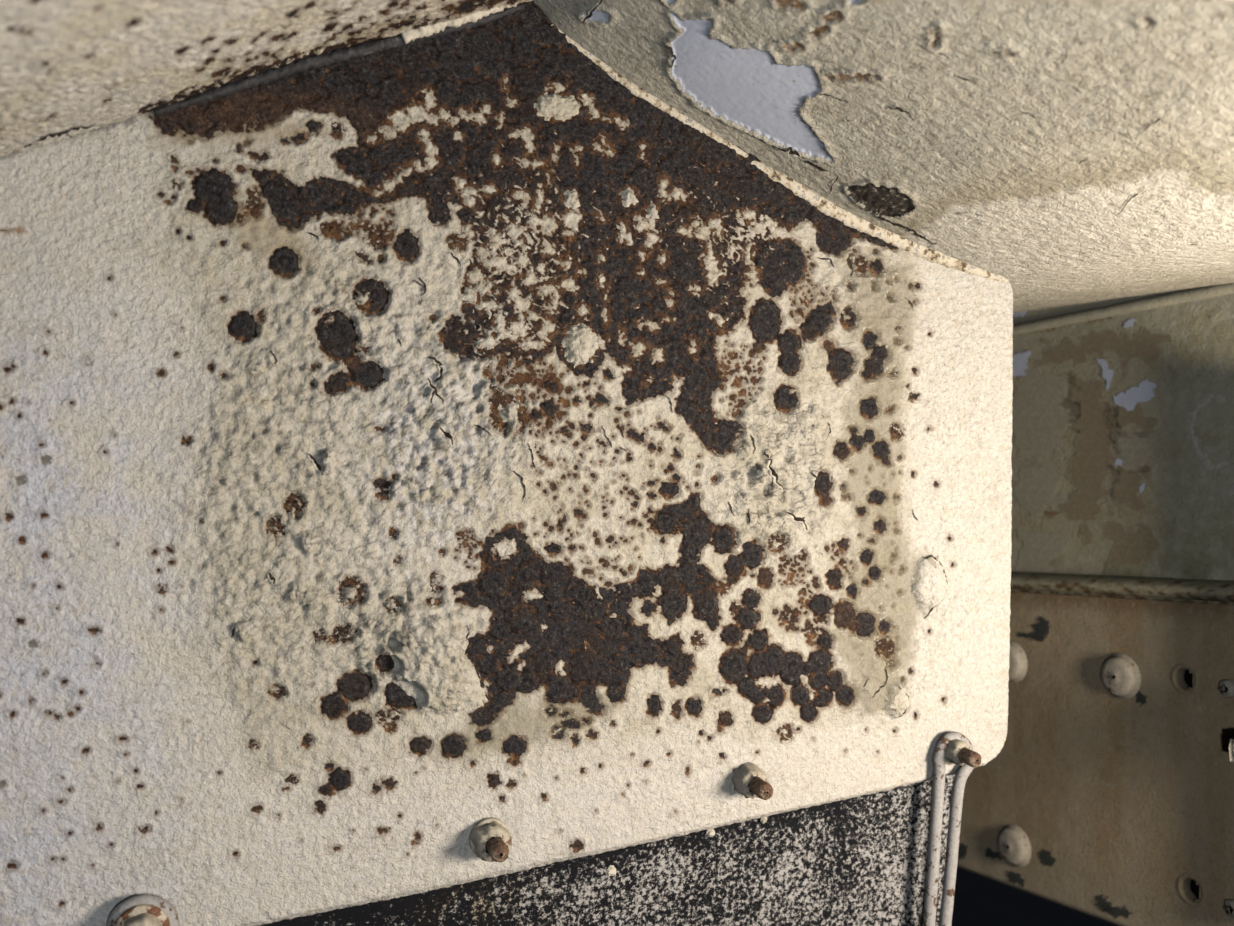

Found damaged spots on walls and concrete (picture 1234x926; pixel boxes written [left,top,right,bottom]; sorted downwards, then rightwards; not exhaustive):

peeling [668,0,833,162]
corrosion [138,0,920,802]
peeling [1012,318,1172,527]
peeling [1017,616,1050,642]
corrosion [314,763,366,814]
peeling [1094,895,1132,918]